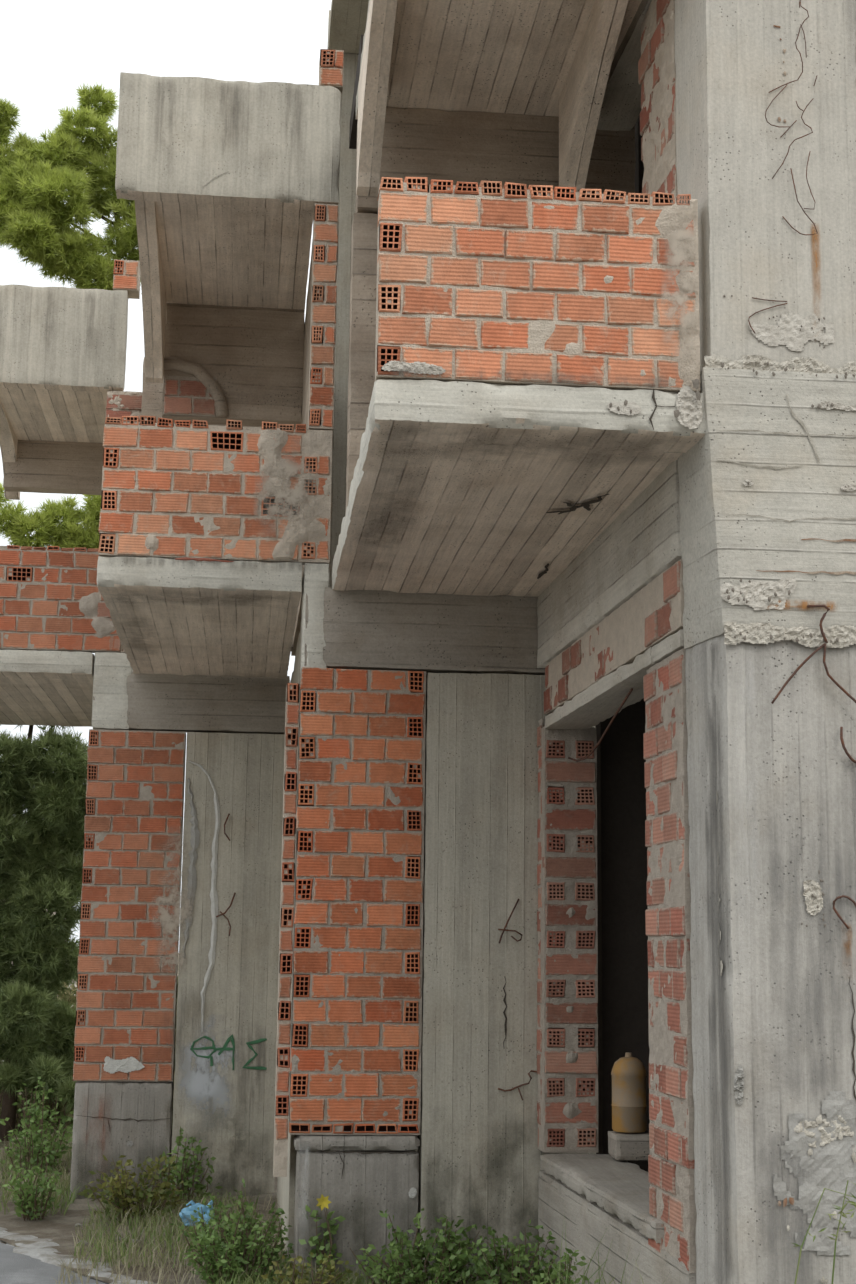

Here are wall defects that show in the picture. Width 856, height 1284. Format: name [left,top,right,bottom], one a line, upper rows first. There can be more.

spalling [749,310,834,351]
crack [546,494,609,514]
spalling [720,577,798,610]
crack [848,979,856,1100]